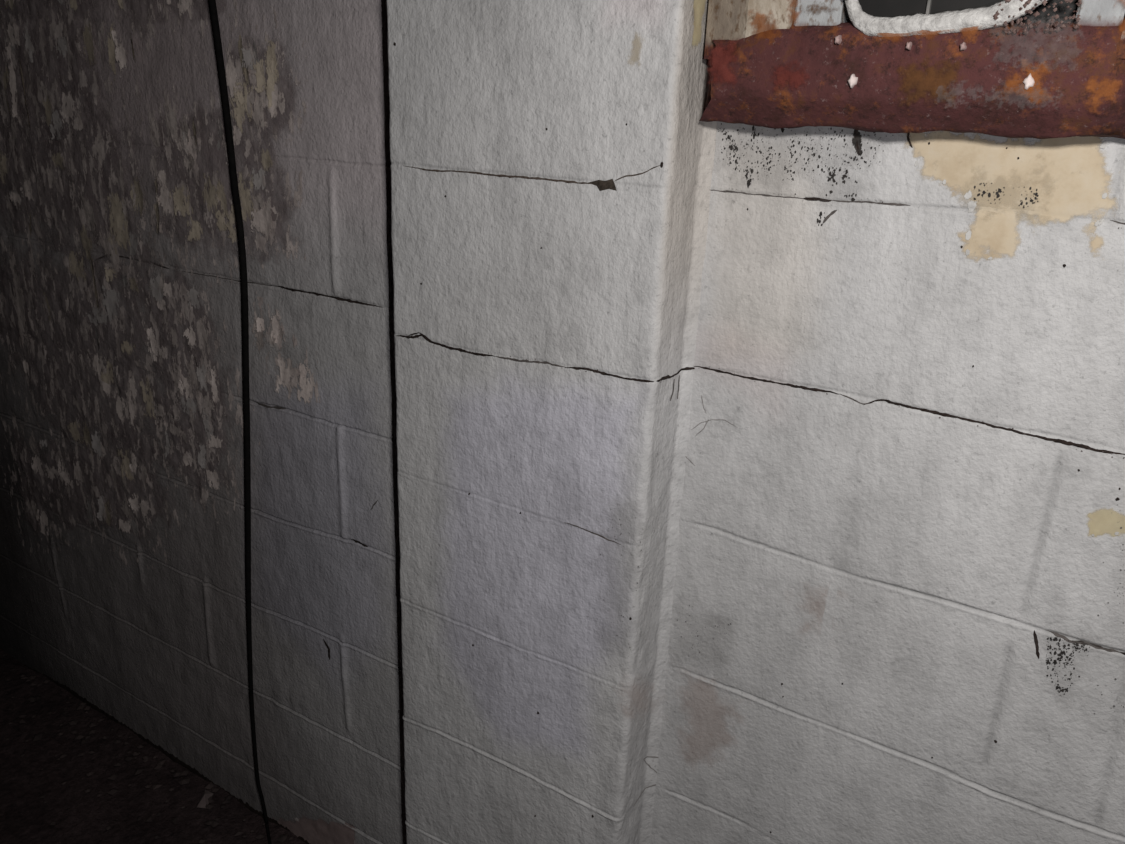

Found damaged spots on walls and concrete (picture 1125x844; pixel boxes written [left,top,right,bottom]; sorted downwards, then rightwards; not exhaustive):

corrosion [752,14,776,39]
corrosion [881,30,941,41]
corrosion [1004,66,1051,103]
crack [406,165,660,191]
mould [718,123,893,201]
crack [711,189,911,206]
peeling [906,131,1115,261]
crack [96,253,382,308]
crack [256,401,286,409]
crack [396,332,1125,466]
peeling [1088,488,1125,537]
crack [1033,630,1125,659]